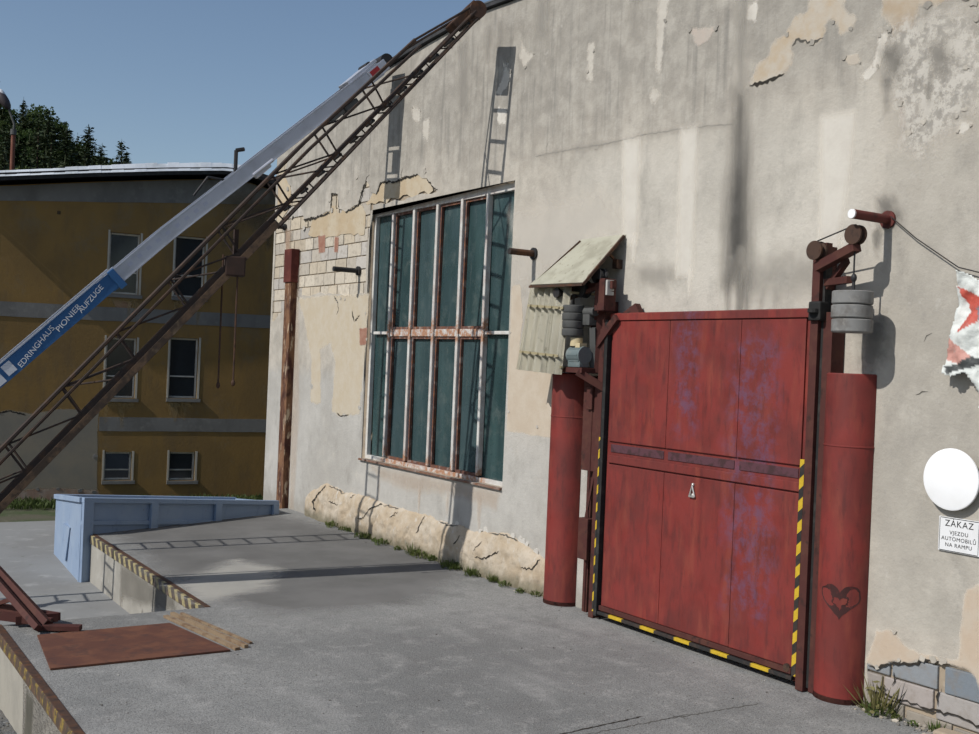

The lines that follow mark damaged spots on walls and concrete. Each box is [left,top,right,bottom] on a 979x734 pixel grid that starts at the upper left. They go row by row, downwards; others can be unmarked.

peeling [497,107,507,124]
peeling [520,44,535,69]
peeling [747,3,758,21]
flaking render [750,0,856,85]
water stain [883,46,900,92]
peeling [842,0,979,158]
water stain [927,44,946,92]
water stain [723,91,751,310]
flaking render [273,163,433,416]
flaking render [867,585,979,734]